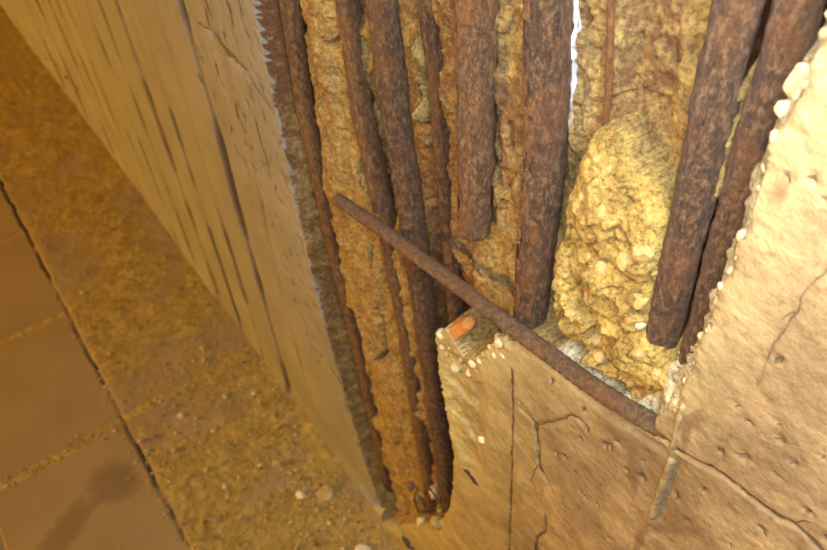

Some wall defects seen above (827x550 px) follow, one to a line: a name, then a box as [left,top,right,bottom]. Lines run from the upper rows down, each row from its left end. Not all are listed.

spalling [196,0,247,71]
spalling [249,0,449,527]
spalling [398,0,524,316]
spalling [432,277,516,486]
corrosion [518,98,540,246]
crack [508,369,583,550]
spalling [532,0,827,424]
crack [670,441,823,550]
crack [758,270,827,383]